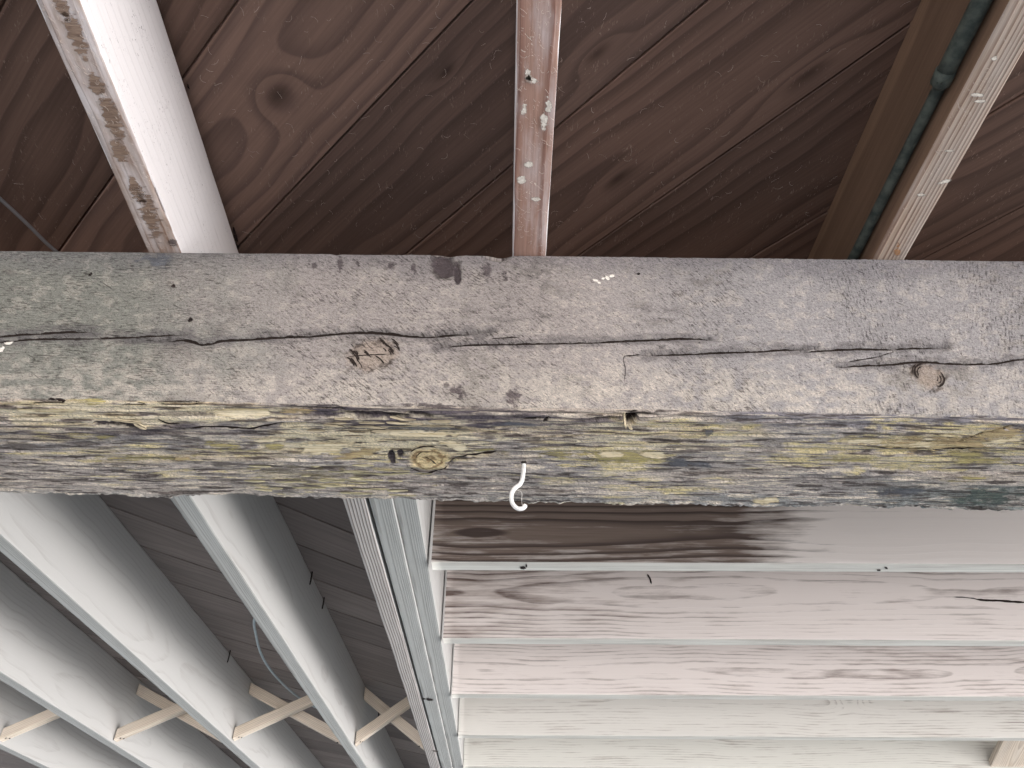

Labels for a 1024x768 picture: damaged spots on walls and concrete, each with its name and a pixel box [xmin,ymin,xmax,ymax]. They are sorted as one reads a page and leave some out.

peeling [53,0,129,162]
peeling [129,177,177,246]
crack [0,331,1024,387]
leakage [405,382,477,409]
leakage [506,390,522,407]
leakage [362,425,466,433]
leakage [538,451,712,468]
leakage [834,425,1024,507]